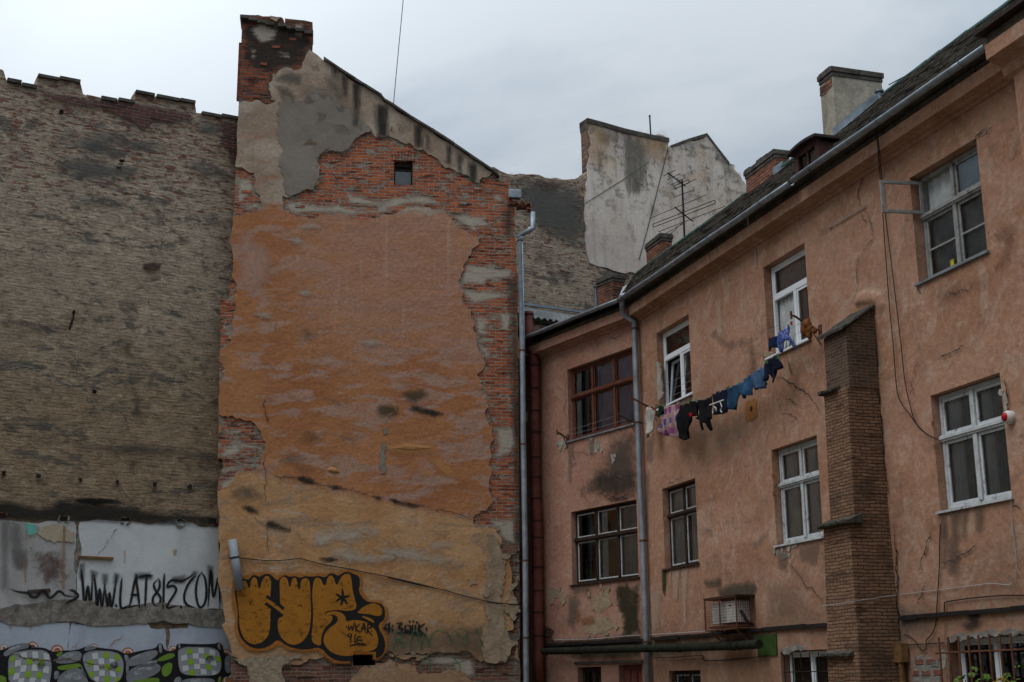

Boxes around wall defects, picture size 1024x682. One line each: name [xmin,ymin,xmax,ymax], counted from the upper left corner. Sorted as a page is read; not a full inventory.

flaking render [239,15,313,104]
flaking render [233,168,262,217]
water stain [334,68,360,121]
water stain [377,106,388,136]
water stain [415,126,428,146]
water stain [447,146,476,181]
water stain [597,131,665,192]
flaking render [282,131,521,682]
crack [776,362,818,420]
flaking render [218,415,265,491]
water stain [590,437,634,490]
crack [873,314,977,636]